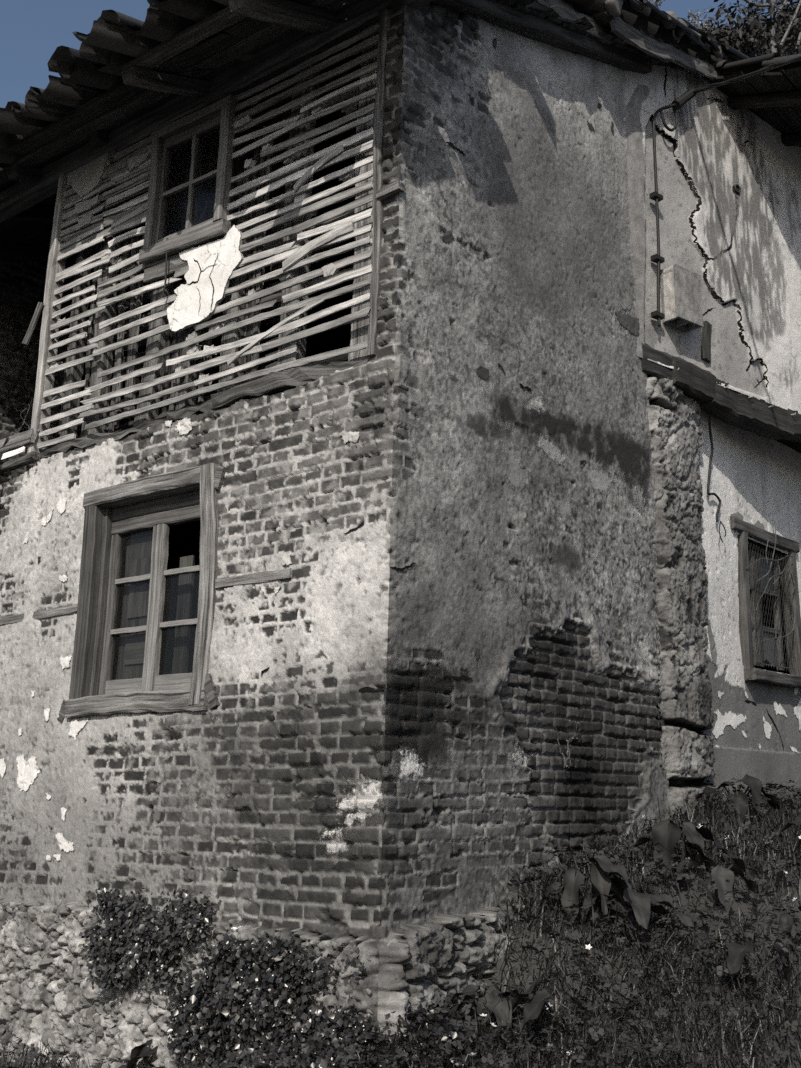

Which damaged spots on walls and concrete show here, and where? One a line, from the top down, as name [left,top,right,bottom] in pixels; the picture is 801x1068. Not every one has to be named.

crack [650,67,769,388]
spalling [176,226,244,332]
leakage [456,396,651,507]
peeling [41,496,66,525]
peeling [59,655,71,669]
peeling [0,755,40,792]
peeling [68,720,88,740]
flaking render [87,722,189,791]
peeling [701,661,801,754]
peeling [46,807,73,861]